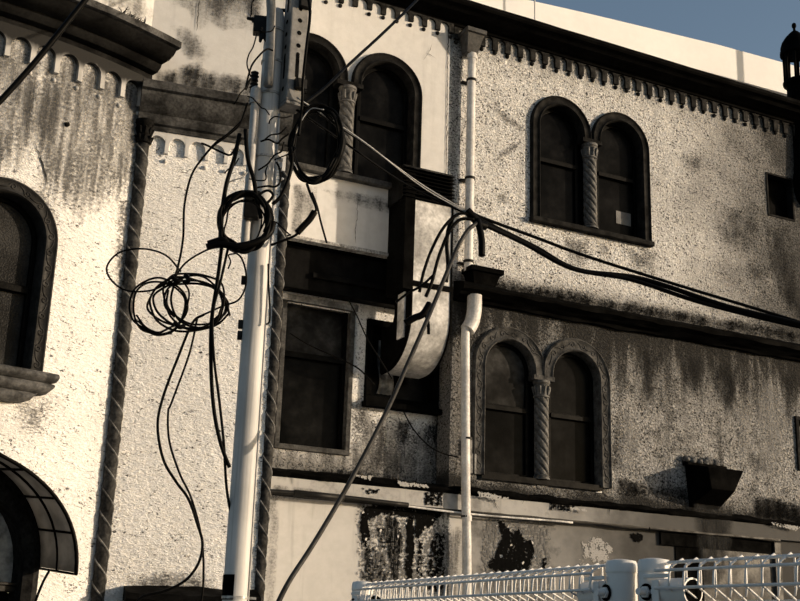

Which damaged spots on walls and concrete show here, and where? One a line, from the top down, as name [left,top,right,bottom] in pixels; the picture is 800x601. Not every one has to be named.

water stain [205,0,259,24]
water stain [179,32,200,55]
water stain [158,65,251,95]
water stain [0,34,138,300]
water stain [643,352,665,398]
water stain [717,364,736,407]
spalling [478,491,509,501]
peeling [550,503,587,512]
water stain [613,415,732,584]
water stain [751,497,800,523]
peeling [355,480,451,596]
peeling [481,517,551,601]